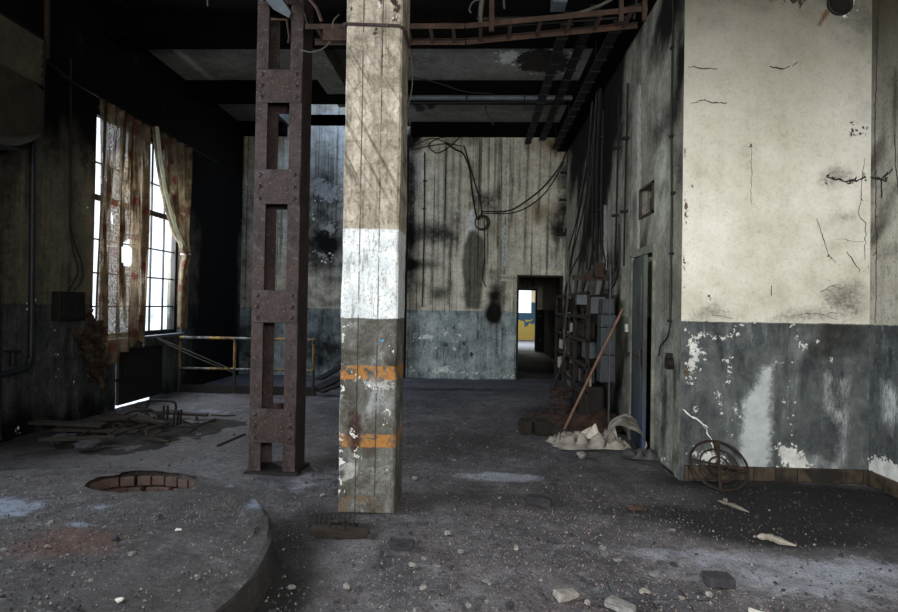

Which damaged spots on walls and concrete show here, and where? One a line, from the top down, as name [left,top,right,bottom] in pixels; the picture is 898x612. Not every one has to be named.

crack [797,0,898,319]
damp [463,232,485,309]
peeling [682,312,767,385]
peeling [338,425,362,495]
corrosion [349,411,360,445]
peeling [686,445,728,465]
flaking render [727,361,814,468]
peeling [868,454,898,482]
damp [883,385,897,422]